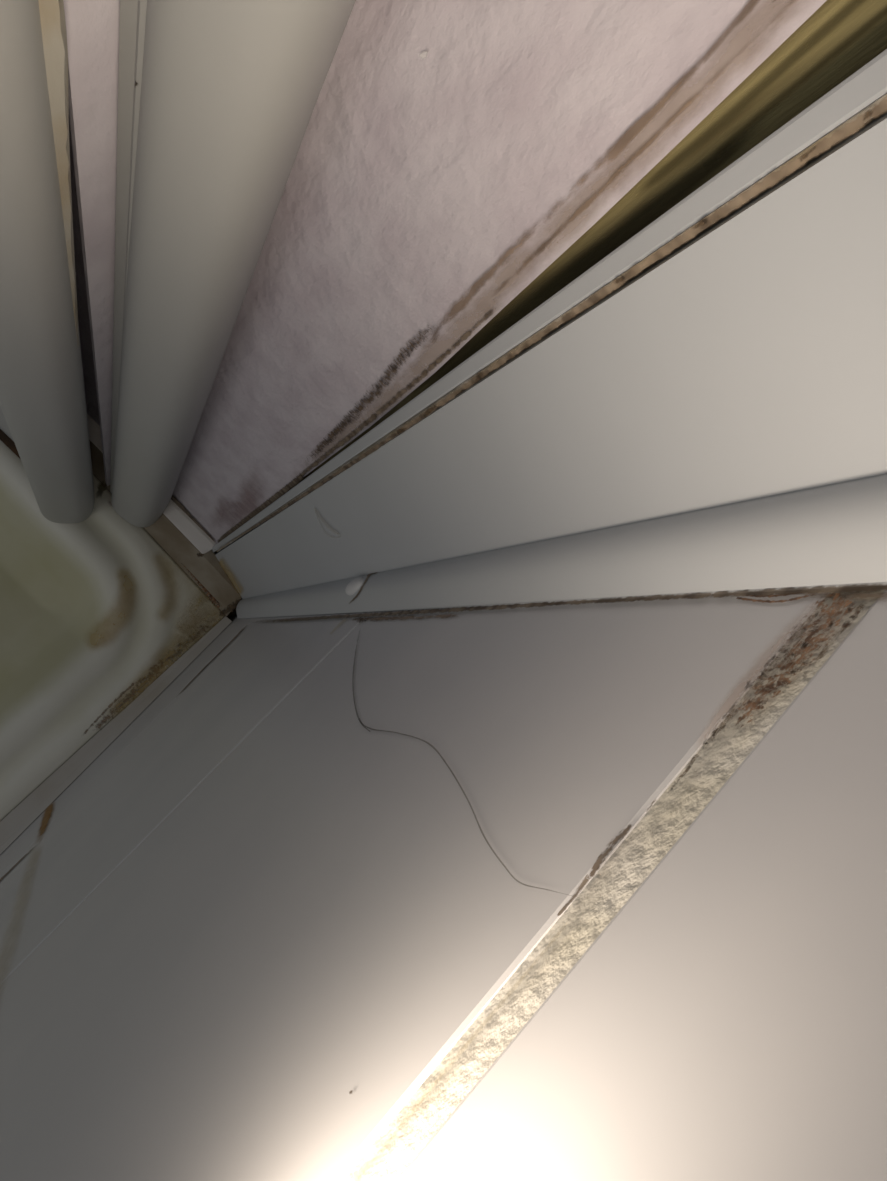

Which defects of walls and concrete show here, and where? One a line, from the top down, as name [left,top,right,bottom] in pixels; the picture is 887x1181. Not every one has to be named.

damp [171,0,887,547]
corrosion [39,804,53,836]
crack [352,617,559,893]
damp [557,825,631,916]